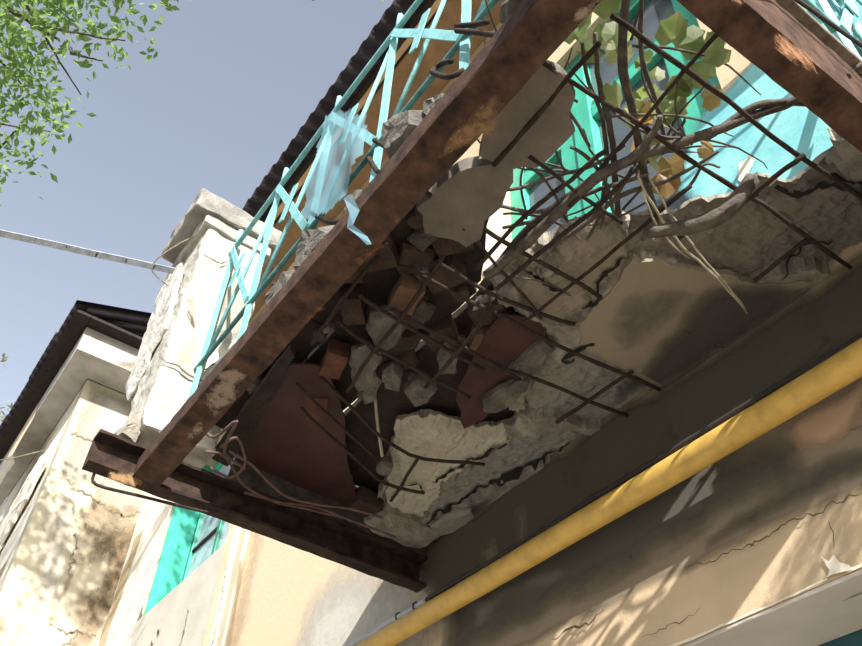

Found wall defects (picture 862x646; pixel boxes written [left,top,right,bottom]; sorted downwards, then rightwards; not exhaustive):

rust [778,35,813,67]
rust [445,101,497,153]
flaking render [300,13,862,517]
peeling [206,369,246,416]
damp [419,253,862,646]
rust [109,472,142,486]
crack [68,532,78,577]
crack [685,493,862,569]
damp [98,527,141,646]
peeling [669,555,862,646]
crack [50,623,103,645]